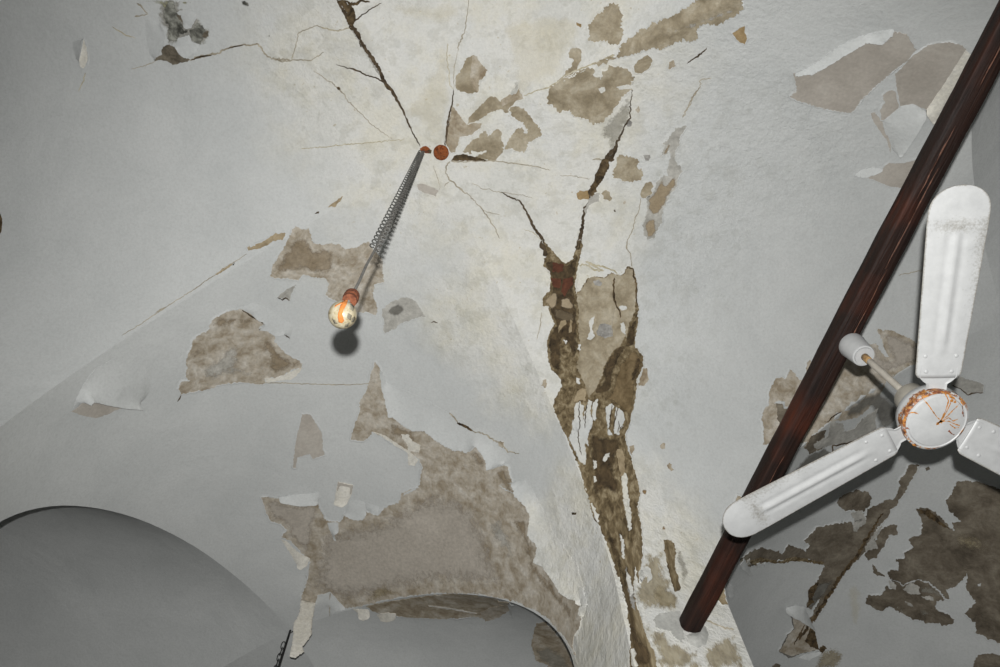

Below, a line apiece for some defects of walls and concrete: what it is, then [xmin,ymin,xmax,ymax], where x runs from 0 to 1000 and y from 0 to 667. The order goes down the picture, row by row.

crack [190,0,420,149]
flaking render [443,53,544,162]
crack [433,0,641,274]
flaking render [545,0,749,127]
flaking render [788,29,971,189]
flaking render [176,224,428,402]
flaking render [759,358,812,445]
flaking render [798,329,917,469]
flaking render [259,360,583,667]
damp [638,553,676,609]
flaking render [738,461,1000,667]